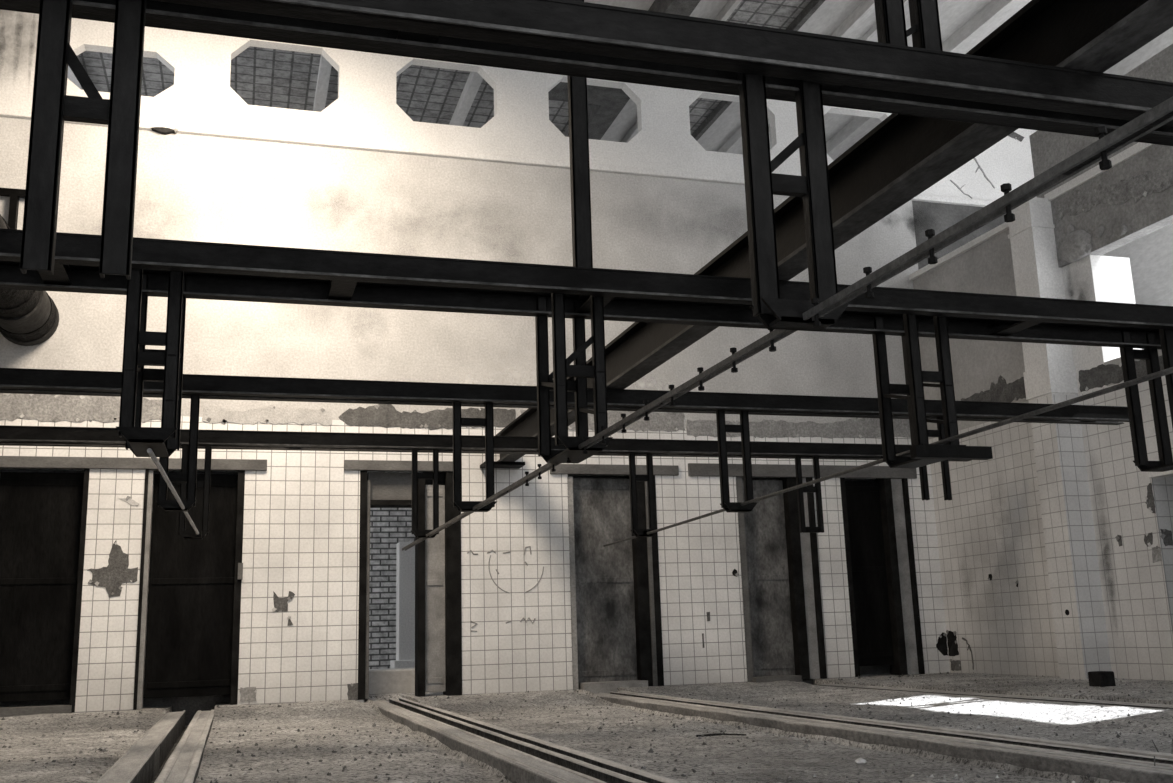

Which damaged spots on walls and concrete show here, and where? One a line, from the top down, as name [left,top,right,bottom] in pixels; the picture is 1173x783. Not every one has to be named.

spalling [1145,483,1156,514]
spalling [1144,529,1173,563]
spalling [88,541,138,597]
spalling [272,591,295,626]